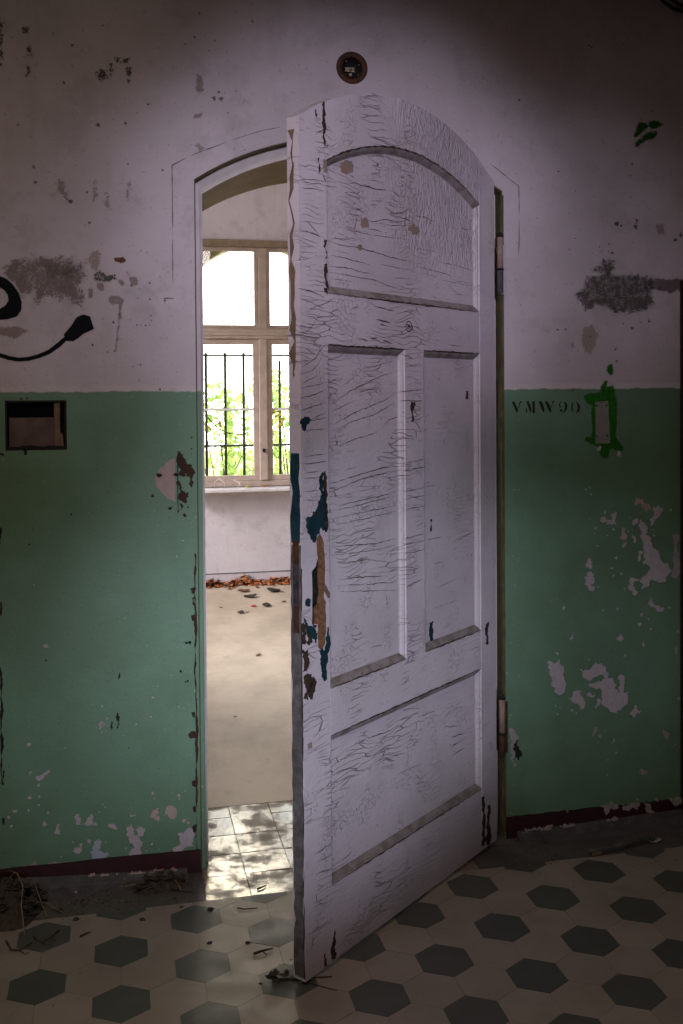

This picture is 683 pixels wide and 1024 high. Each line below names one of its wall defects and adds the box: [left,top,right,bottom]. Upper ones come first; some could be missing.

damp [4,253,116,310]
crack [299,165,473,607]
peeling [584,498,680,630]
peeling [545,650,641,717]
peeling [49,791,195,864]
peeling [602,797,682,822]